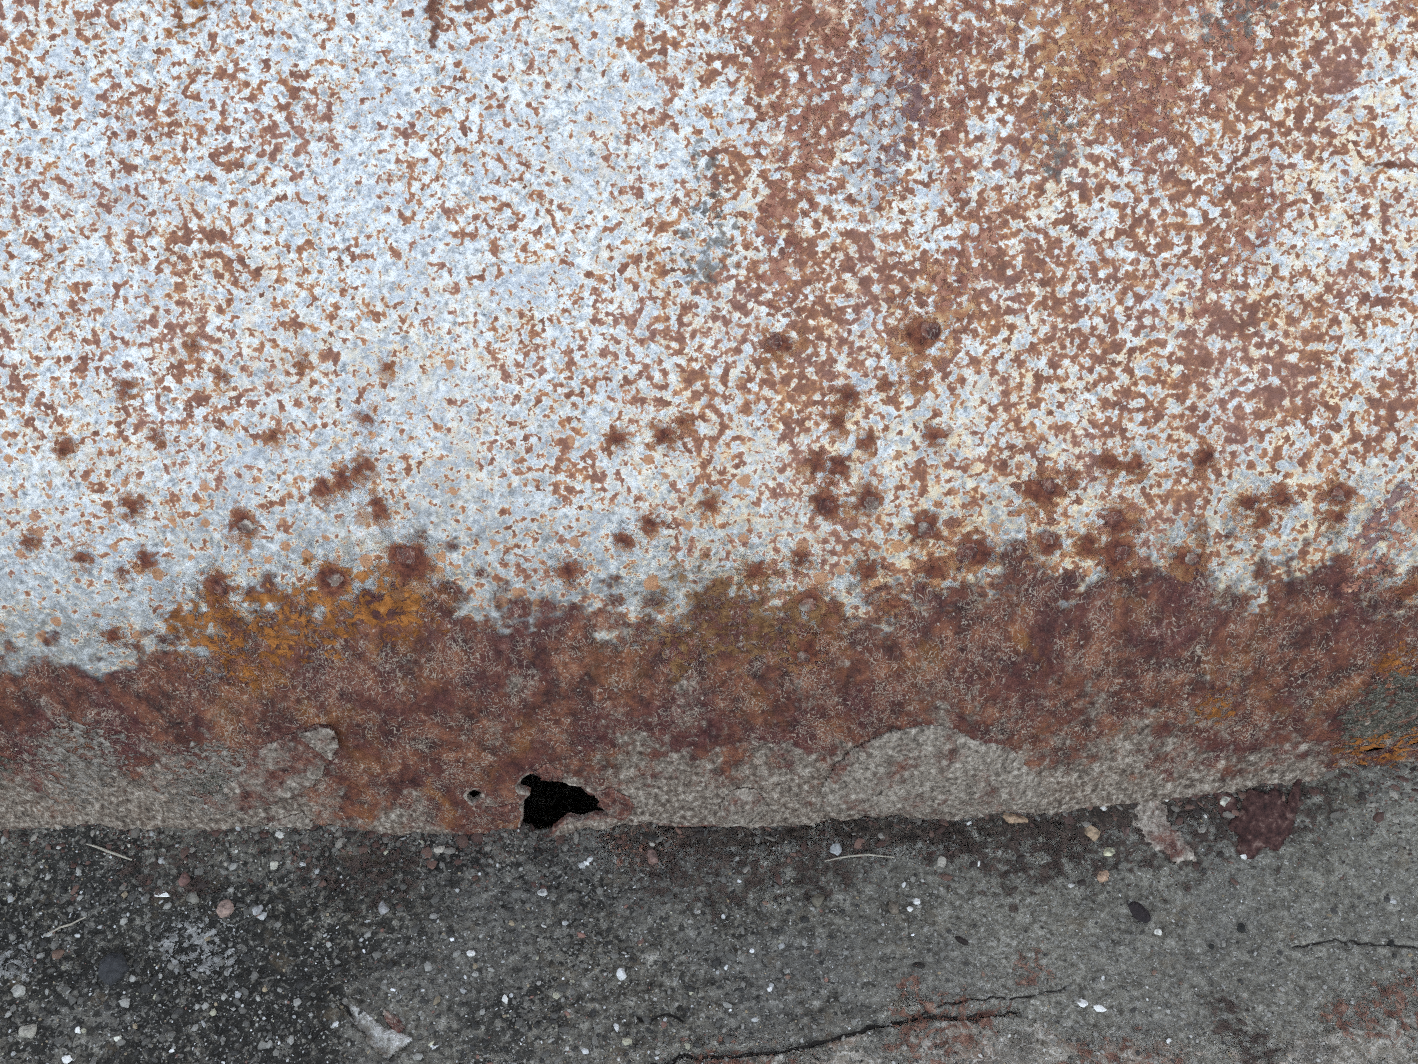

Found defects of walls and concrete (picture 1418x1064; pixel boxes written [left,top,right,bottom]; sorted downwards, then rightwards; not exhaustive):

corrosion [1376,0,1418,32]
corrosion [706,0,1354,521]
corrosion [653,412,690,449]
corrosion [0,480,1418,870]
peeling [533,764,565,782]
crack [1292,939,1418,949]
crack [636,986,1067,1064]